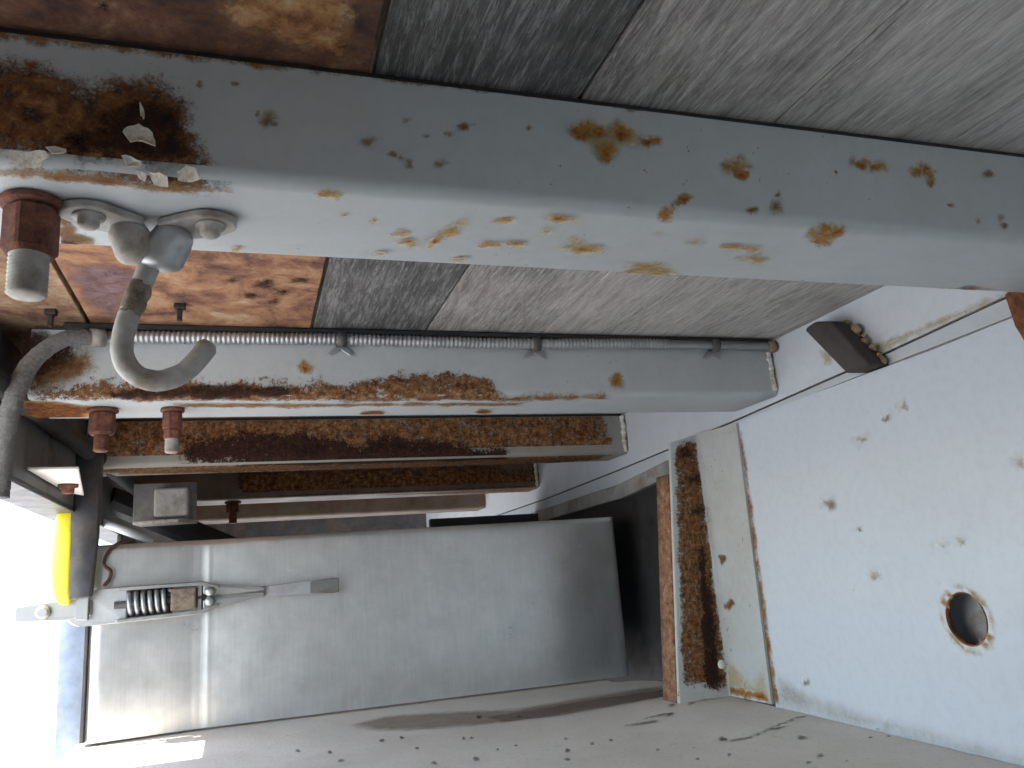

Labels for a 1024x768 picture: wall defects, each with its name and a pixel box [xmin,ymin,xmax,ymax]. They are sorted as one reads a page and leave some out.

rust [220,0,355,58]
peeling [2,146,67,168]
rust [0,57,229,193]
peeling [123,102,156,146]
peeling [121,155,200,187]
rust [570,120,661,163]
rust [658,194,691,222]
rust [808,224,844,247]
rust [16,331,48,355]
rust [21,346,623,497]
rust [656,440,778,703]
damp [362,688,663,729]